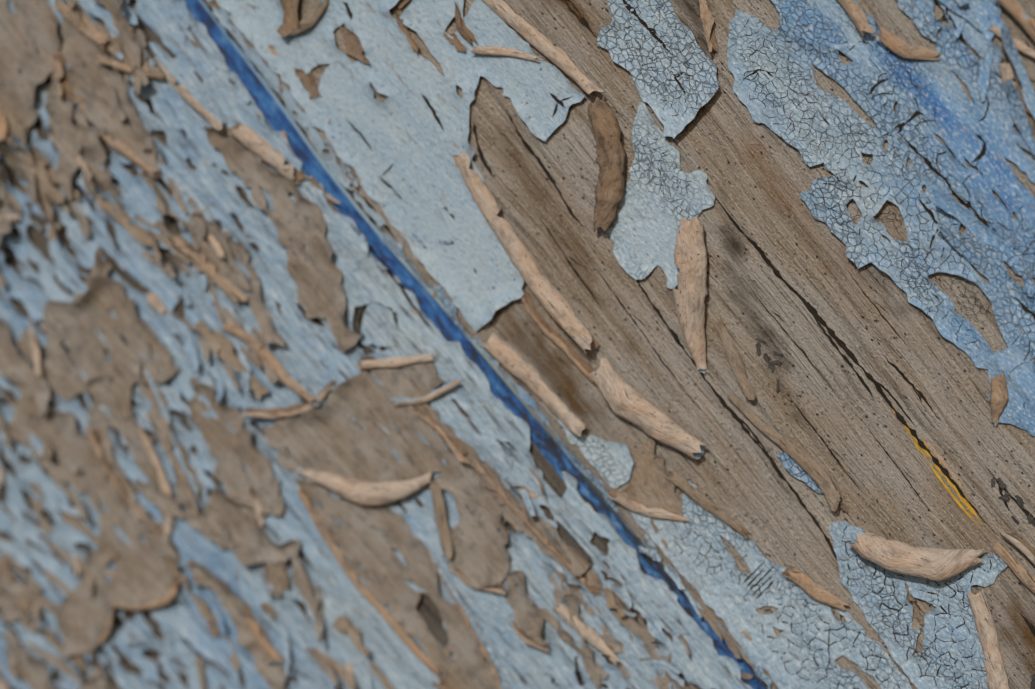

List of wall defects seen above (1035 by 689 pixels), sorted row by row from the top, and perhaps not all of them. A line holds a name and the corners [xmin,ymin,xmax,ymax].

crack [622,0,685,94]
crack [869,78,889,95]
crack [894,111,996,232]
crack [936,5,967,46]
crack [972,96,989,163]
peeling [208,0,1035,689]
crack [715,197,1035,533]
crack [743,561,774,600]